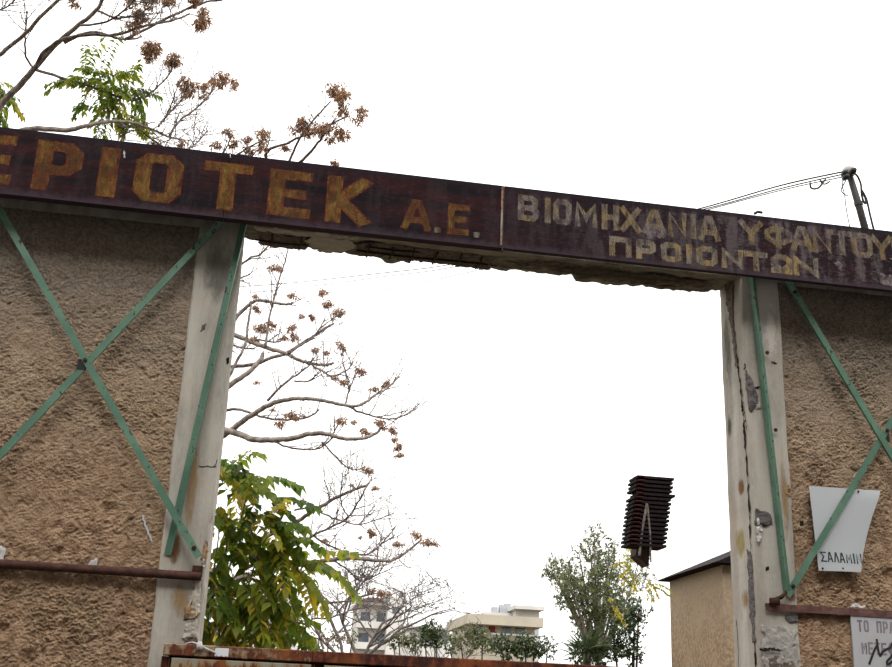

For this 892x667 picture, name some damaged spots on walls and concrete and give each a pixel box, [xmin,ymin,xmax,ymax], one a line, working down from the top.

spalling [253,226,497,270]
spalling [754,509,773,545]
flaking render [747,549,801,667]